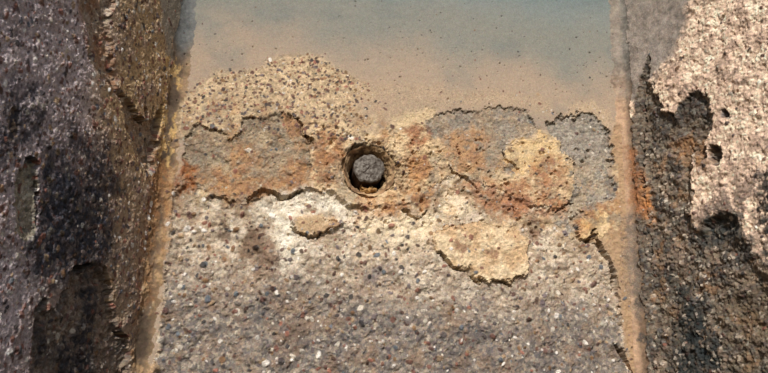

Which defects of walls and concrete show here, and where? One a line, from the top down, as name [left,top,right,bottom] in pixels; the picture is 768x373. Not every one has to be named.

spalling [79,0,161,174]
spalling [29,259,132,373]
corrosion [129,111,348,333]
spalling [153,104,631,373]
crack [583,228,617,293]
crack [612,343,633,373]
spalling [630,54,768,373]